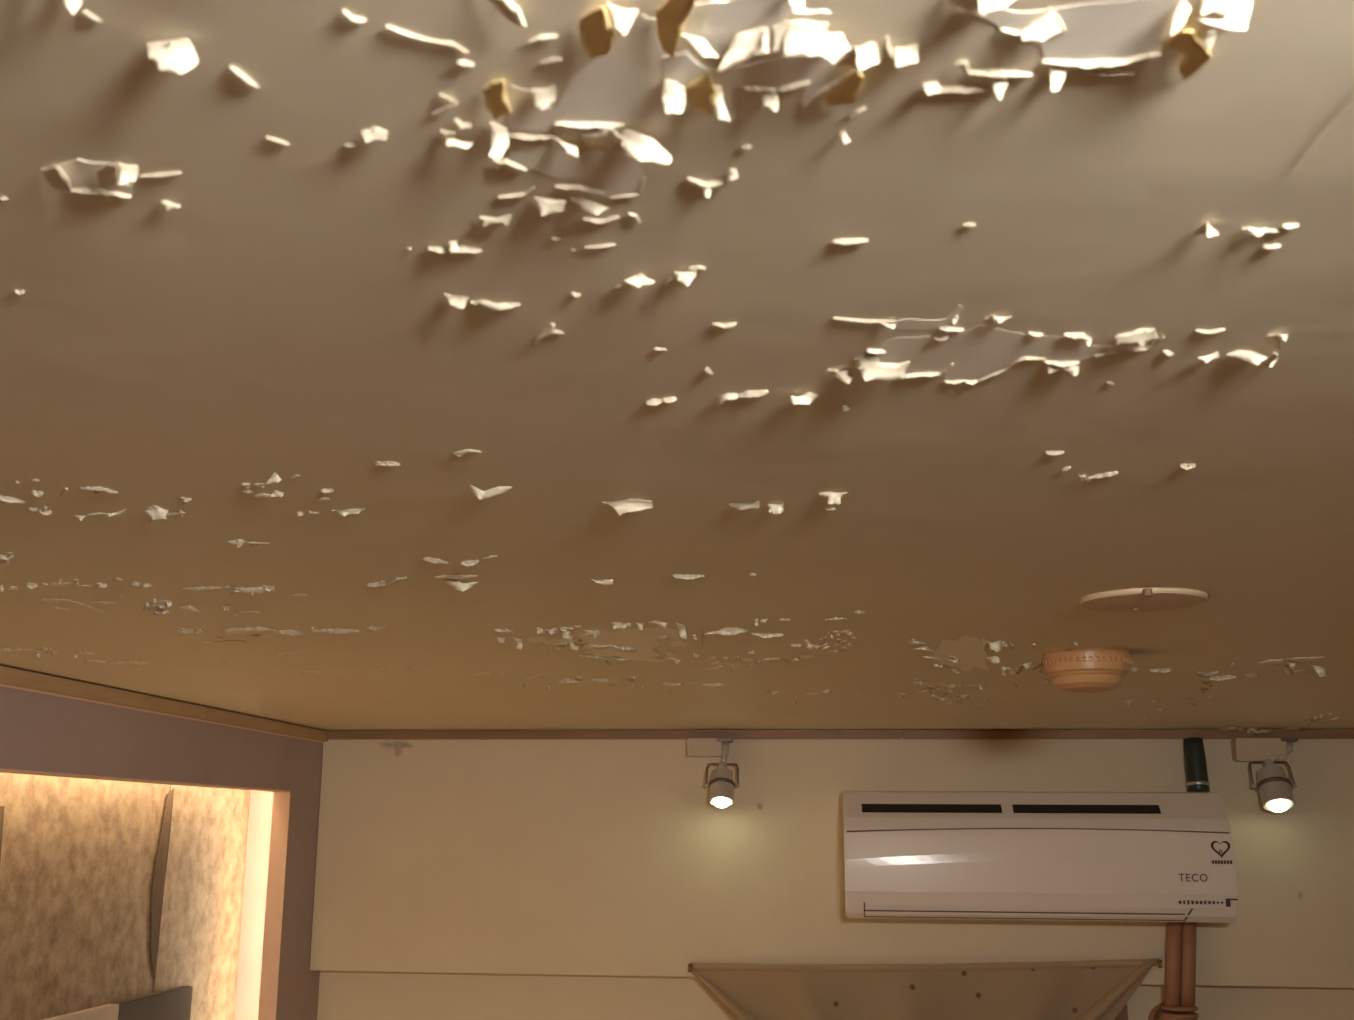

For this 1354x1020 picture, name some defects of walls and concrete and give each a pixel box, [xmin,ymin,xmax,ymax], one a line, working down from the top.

peeling [64,0,101,22]
peeling [147,39,198,75]
peeling [923,0,1252,101]
peeling [431,93,473,149]
peeling [482,0,918,224]
peeling [41,158,182,198]
peeling [428,241,482,255]
peeling [616,266,706,288]
peeling [444,293,521,310]
peeling [828,305,1174,385]
peeling [1198,332,1288,367]
peeling [475,610,865,696]